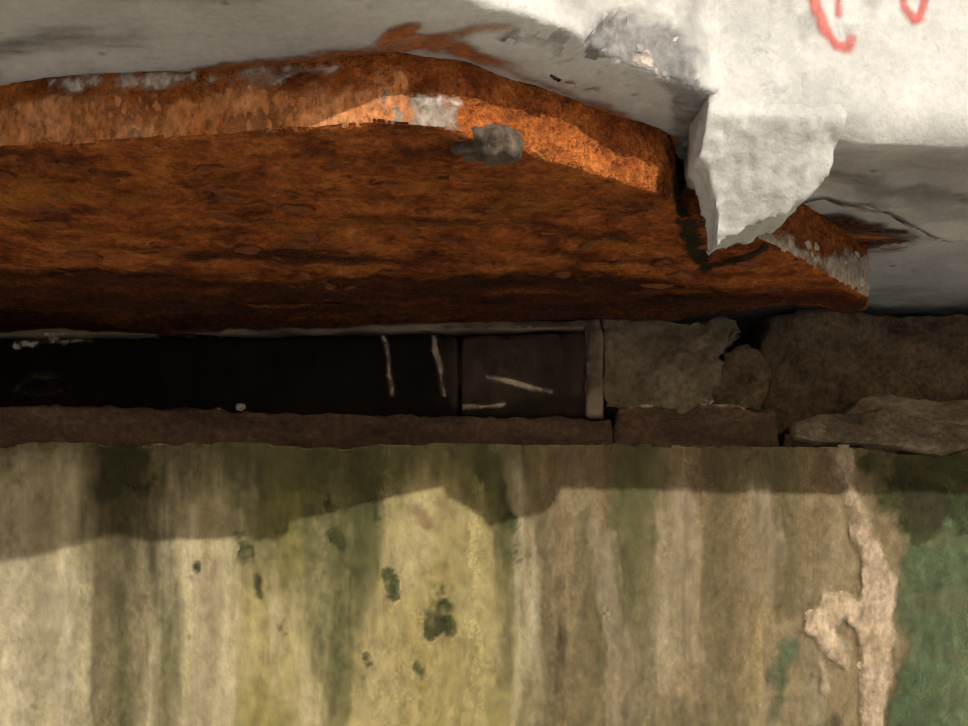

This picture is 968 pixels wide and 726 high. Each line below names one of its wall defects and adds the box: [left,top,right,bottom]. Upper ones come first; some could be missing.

corrosion [0,24,504,146]
corrosion [0,214,918,338]
water stain [504,509,518,533]
water stain [72,442,210,726]
water stain [523,443,968,726]